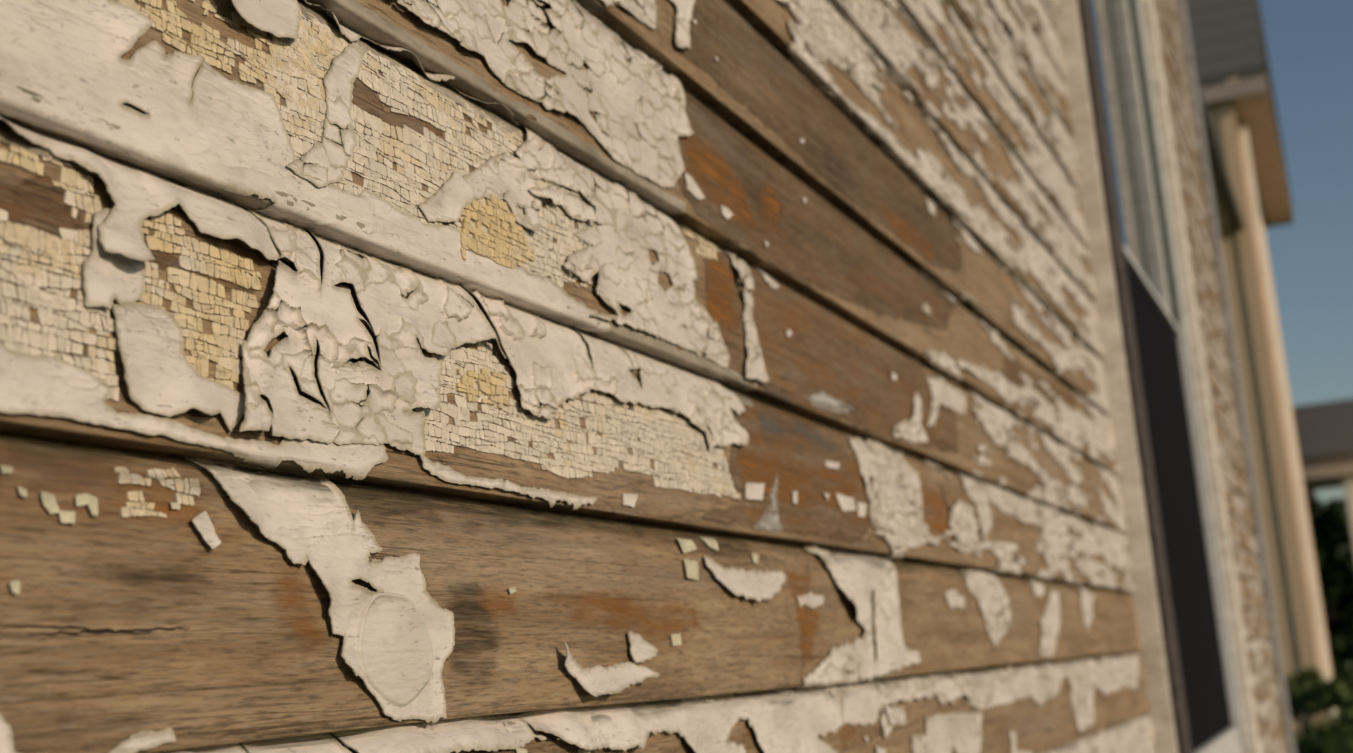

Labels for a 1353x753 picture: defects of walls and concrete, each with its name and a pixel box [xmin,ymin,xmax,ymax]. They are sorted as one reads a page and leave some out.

crack [334,283,376,368]
crack [485,340,508,372]
peeling [678,0,1134,631]
peeling [0,433,1155,753]